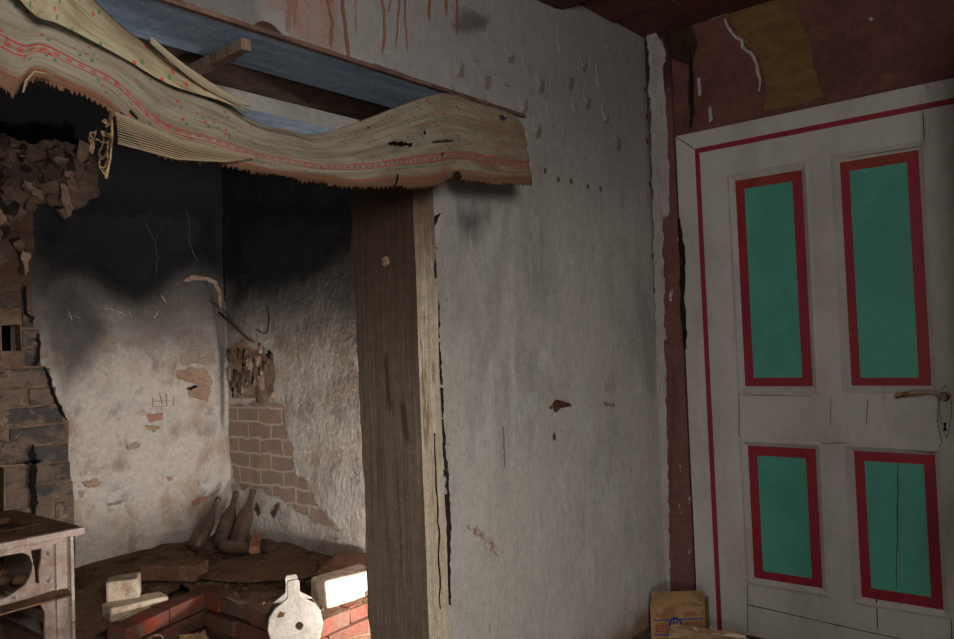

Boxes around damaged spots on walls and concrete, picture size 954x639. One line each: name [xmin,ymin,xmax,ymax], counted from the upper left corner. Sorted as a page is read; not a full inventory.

rust [327,0,357,56]
rust [381,0,408,51]
peeling [712,0,824,112]
flaking render [0,133,101,277]
flaking render [176,350,215,400]
flaking render [227,339,339,540]
crack [434,258,452,605]
flaking render [549,400,571,413]